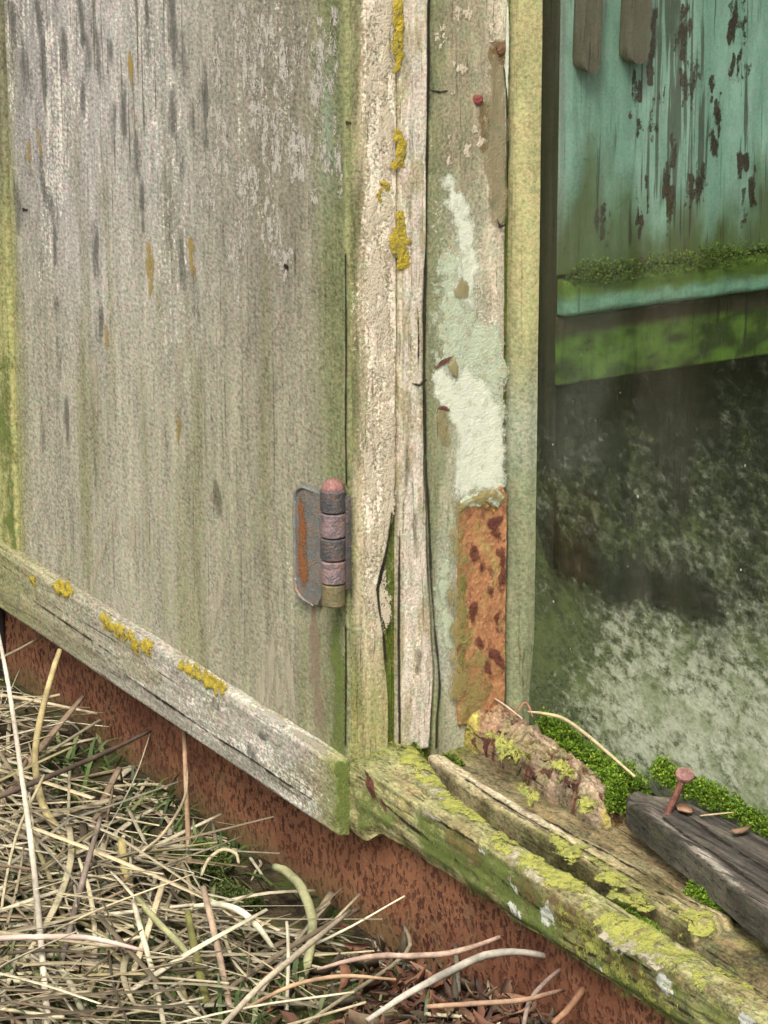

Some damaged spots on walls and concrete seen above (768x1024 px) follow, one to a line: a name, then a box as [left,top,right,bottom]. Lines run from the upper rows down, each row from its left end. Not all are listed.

peeling [727,0,751,79]
peeling [662,3,722,237]
peeling [737,151,757,228]
peeling [430,133,509,513]
rust [296,495,308,585]
rust [470,544,484,572]
rust [487,515,506,595]
crack [376,512,401,744]
rust [476,636,505,674]
crack [381,801,491,870]
crack [465,779,707,926]
crack [662,807,768,894]